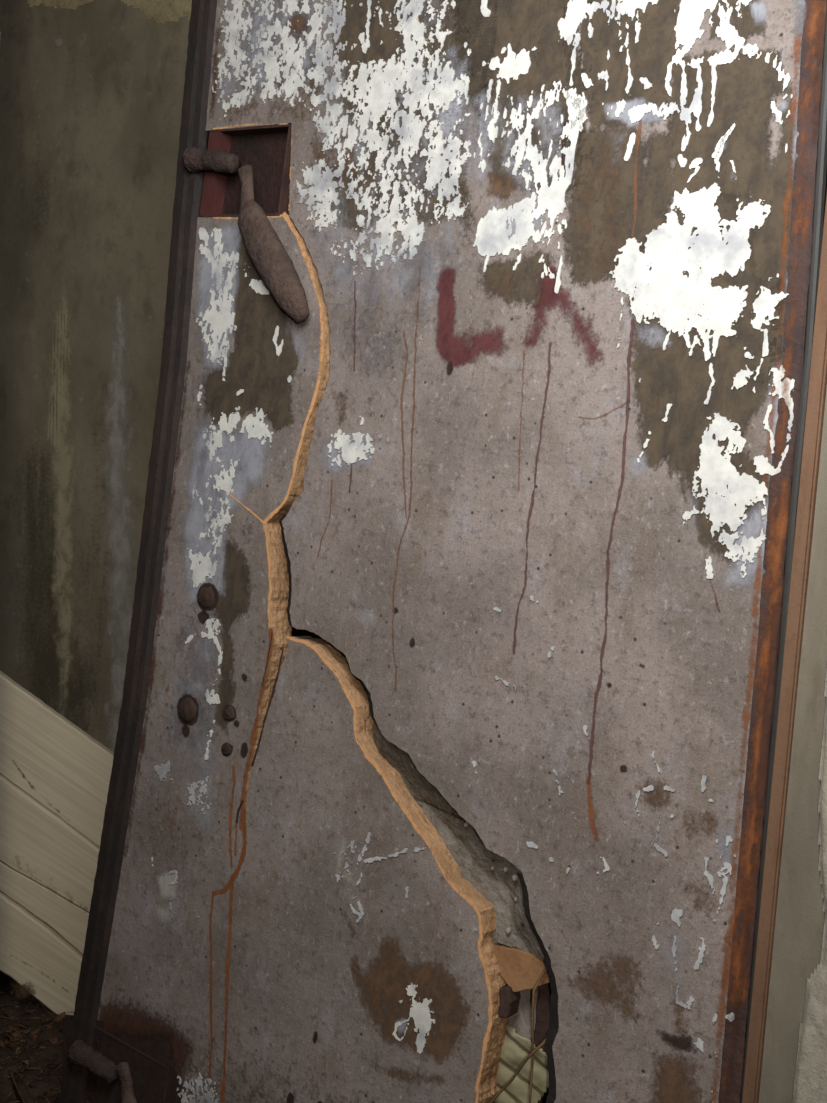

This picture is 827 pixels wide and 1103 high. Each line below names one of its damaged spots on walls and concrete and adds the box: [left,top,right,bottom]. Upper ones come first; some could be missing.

peeling [212,0,799,583]
rust [82,1003,192,1103]
damp [177,1072,219,1103]
rust [208,765,246,1103]
peeling [177,226,304,780]
crack [213,123,509,1103]
spalling [372,720,546,959]
crack [512,342,552,654]
crack [508,860,559,1103]
damp [635,750,675,857]
damp [674,816,736,922]
rust [717,474,793,1036]